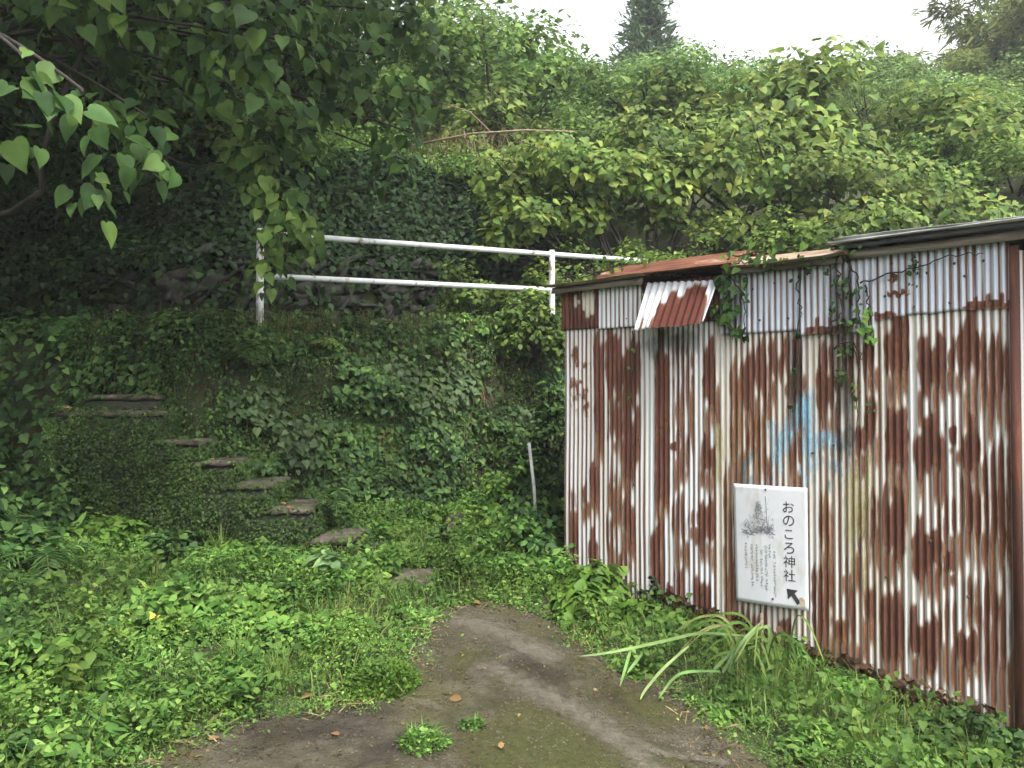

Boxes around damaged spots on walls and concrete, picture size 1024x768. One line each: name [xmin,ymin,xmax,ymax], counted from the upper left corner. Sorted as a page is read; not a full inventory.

corrosion [569,283,1014,728]
corrosion [887,273,910,298]